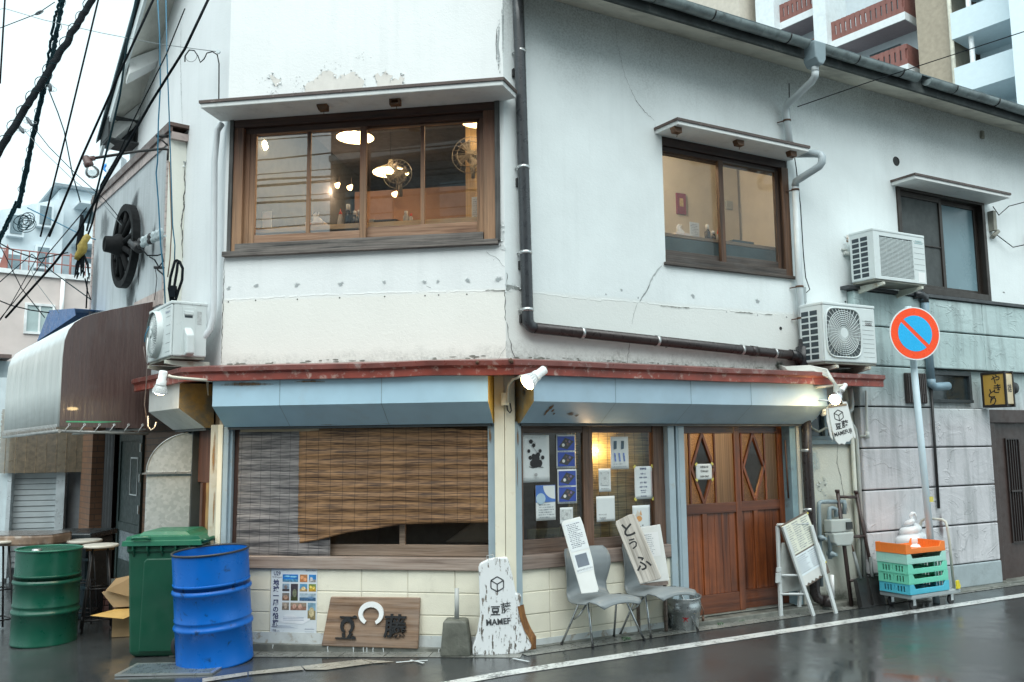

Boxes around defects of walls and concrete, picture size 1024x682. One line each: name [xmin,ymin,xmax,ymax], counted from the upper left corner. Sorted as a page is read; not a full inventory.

peeling [299,62,405,92]
crack [627,265,662,362]